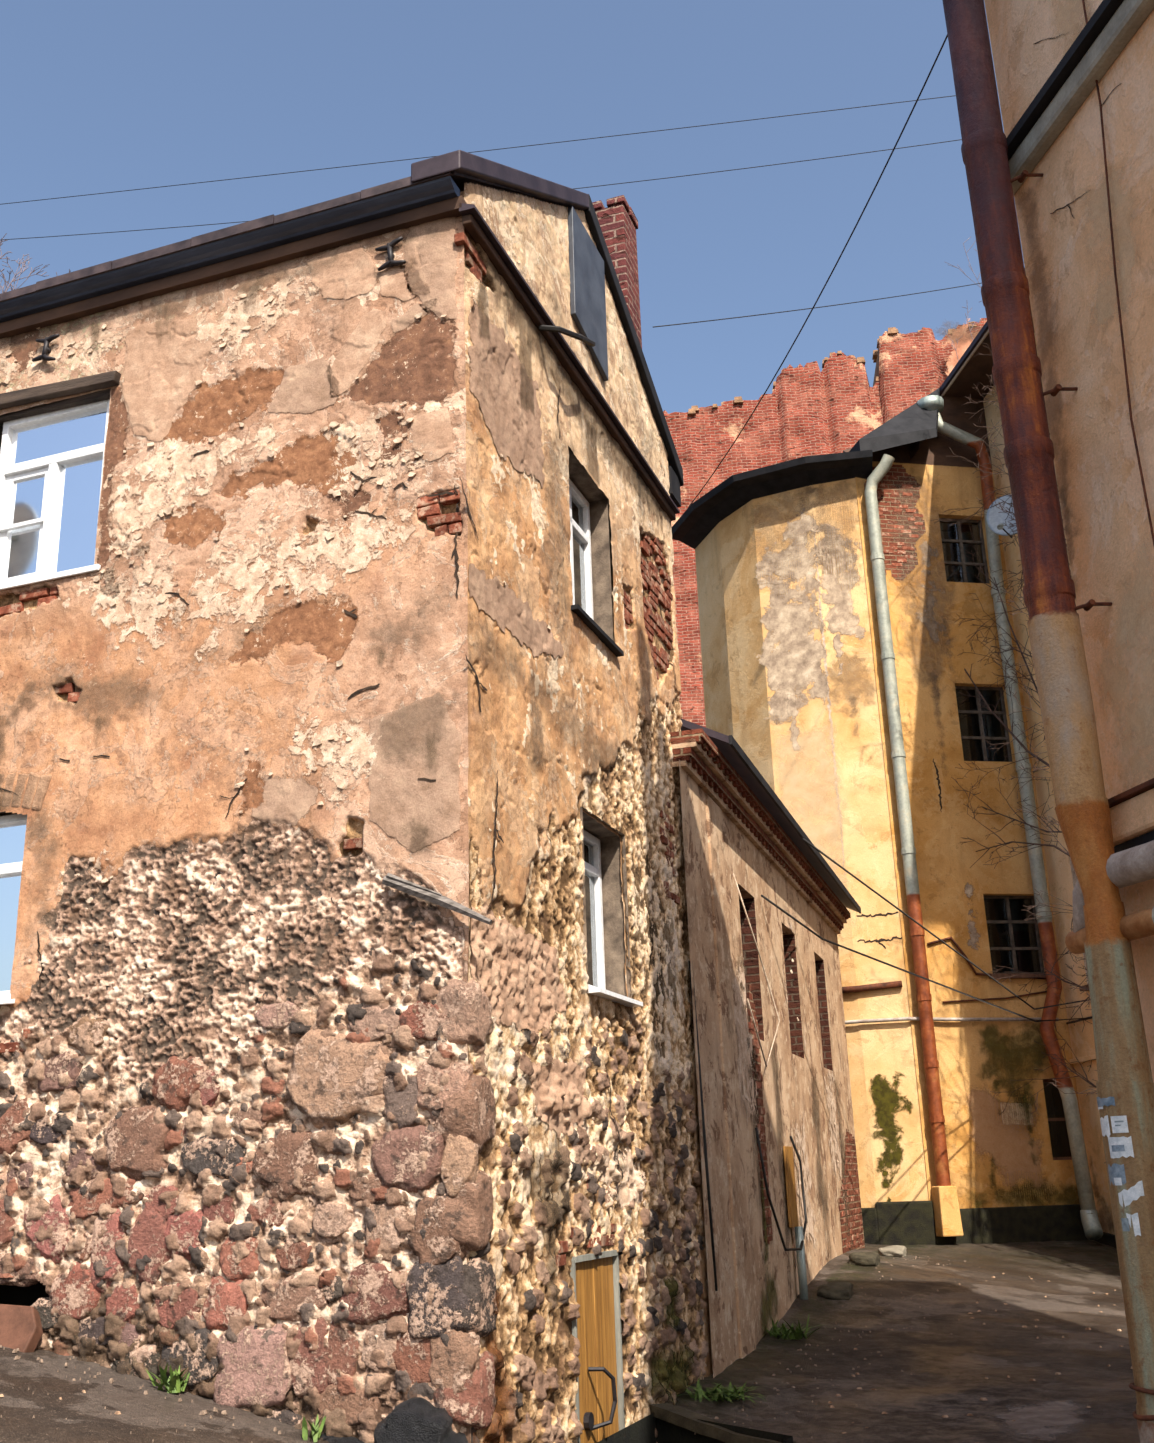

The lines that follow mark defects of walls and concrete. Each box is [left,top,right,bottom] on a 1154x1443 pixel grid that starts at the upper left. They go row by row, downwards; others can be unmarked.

flaking render [0,319,123,392]
peeling [85,258,463,671]
spalling [864,464,946,643]
flaking render [756,505,866,882]
spalling [0,529,793,1443]
peeling [782,908,808,1056]
peeling [792,1106,817,1249]
spalling [824,1069,865,1254]
damp [982,1025,1048,1164]